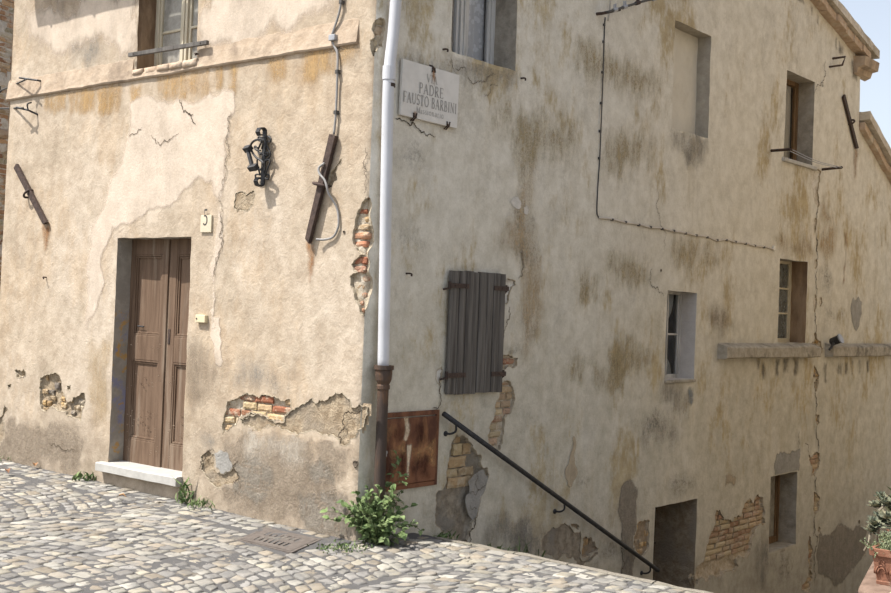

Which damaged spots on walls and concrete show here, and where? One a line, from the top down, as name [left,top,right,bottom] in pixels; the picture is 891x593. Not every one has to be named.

crack [129,102,195,146]
flaking render [349,197,374,316]
flaking render [0,404,82,469]
flaking render [39,372,86,422]
flaking render [487,354,518,451]
flaking render [435,434,490,542]
peeling [541,522,599,565]
flaking render [688,494,766,586]